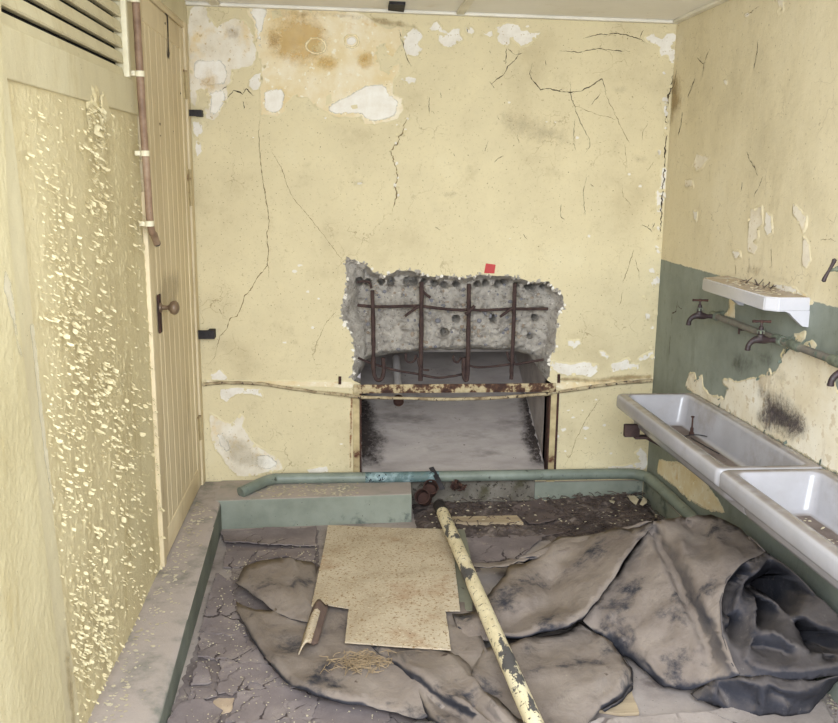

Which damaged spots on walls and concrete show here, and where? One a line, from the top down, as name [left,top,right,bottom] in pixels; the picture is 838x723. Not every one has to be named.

peeling [180,6,541,158]
crack [490,48,648,164]
crack [568,31,643,53]
crack [208,131,340,365]
peeling [208,412,283,477]
spalling [205,257,655,403]
peeling [685,328,838,475]
mould [759,396,805,434]